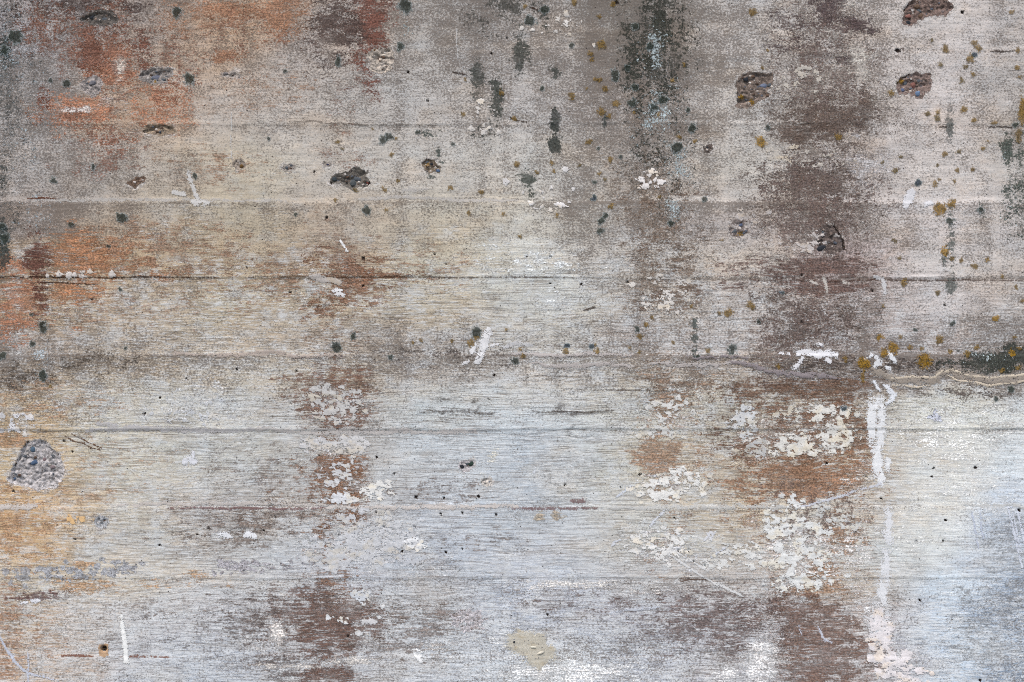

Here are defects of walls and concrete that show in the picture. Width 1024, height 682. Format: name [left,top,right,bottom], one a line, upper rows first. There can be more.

spalling [902,0,956,26]
rust [11,0,319,191]
spalling [733,61,825,110]
spalling [894,69,936,100]
spalling [321,161,371,191]
leakage [605,0,909,435]
rust [0,206,476,352]
leakage [474,240,580,311]
peeling [275,383,428,574]
peeling [724,401,868,460]
leakage [148,394,1024,682]
peeling [623,493,871,593]